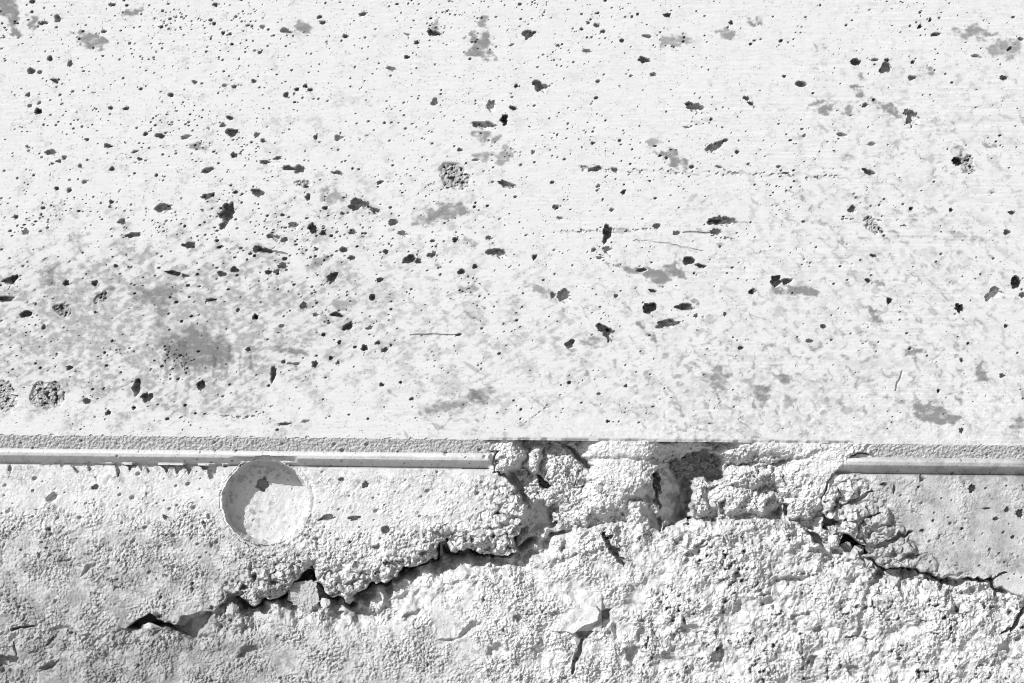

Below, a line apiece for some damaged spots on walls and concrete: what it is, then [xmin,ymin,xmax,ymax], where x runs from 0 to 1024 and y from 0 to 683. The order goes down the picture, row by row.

spalling [486,440,871,547]
crack [127,536,515,641]
crack [806,485,1024,640]
crack [570,638,585,675]